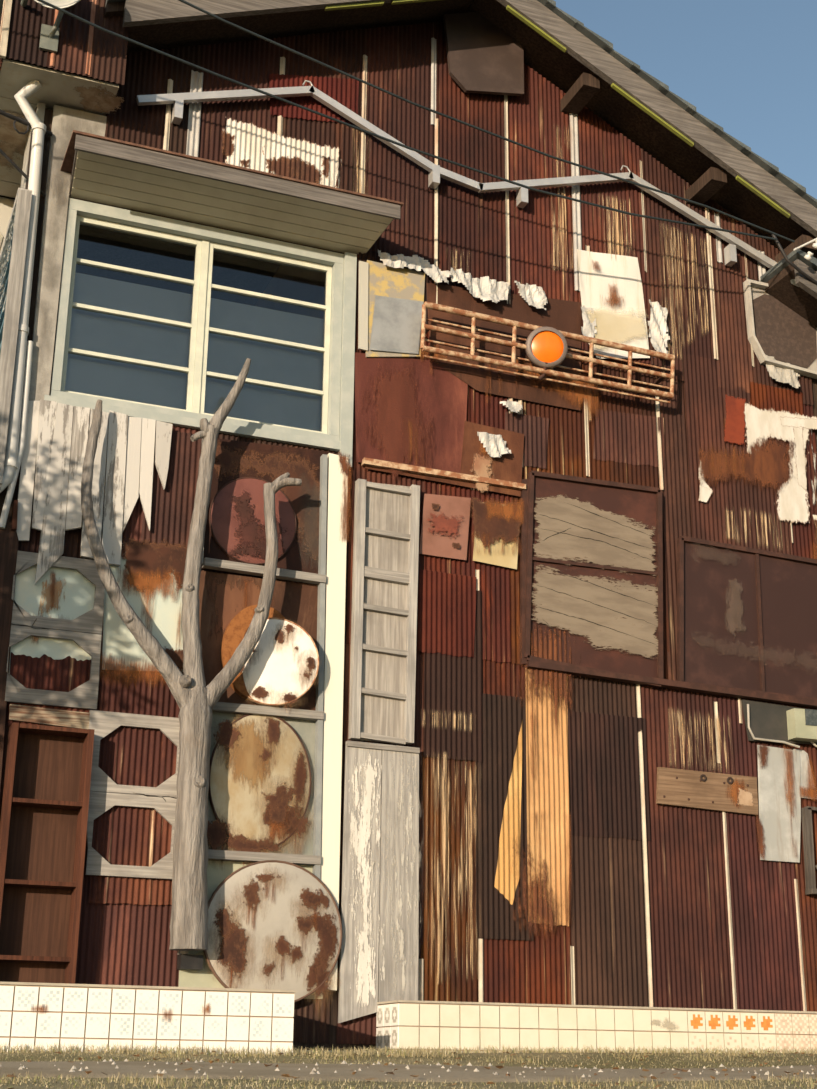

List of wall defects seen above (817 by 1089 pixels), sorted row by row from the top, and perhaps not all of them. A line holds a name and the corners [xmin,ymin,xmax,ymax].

peeling [221,118,340,188]
peeling [0,207,16,312]
rust [214,441,320,561]
rust [339,283,599,553]
rust [699,395,794,492]
peeling [744,403,817,524]
rust [251,686,269,698]
rust [207,718,310,863]
rust [215,874,283,988]
rust [263,888,339,995]
peeling [344,754,418,1008]
rust [431,754,474,982]